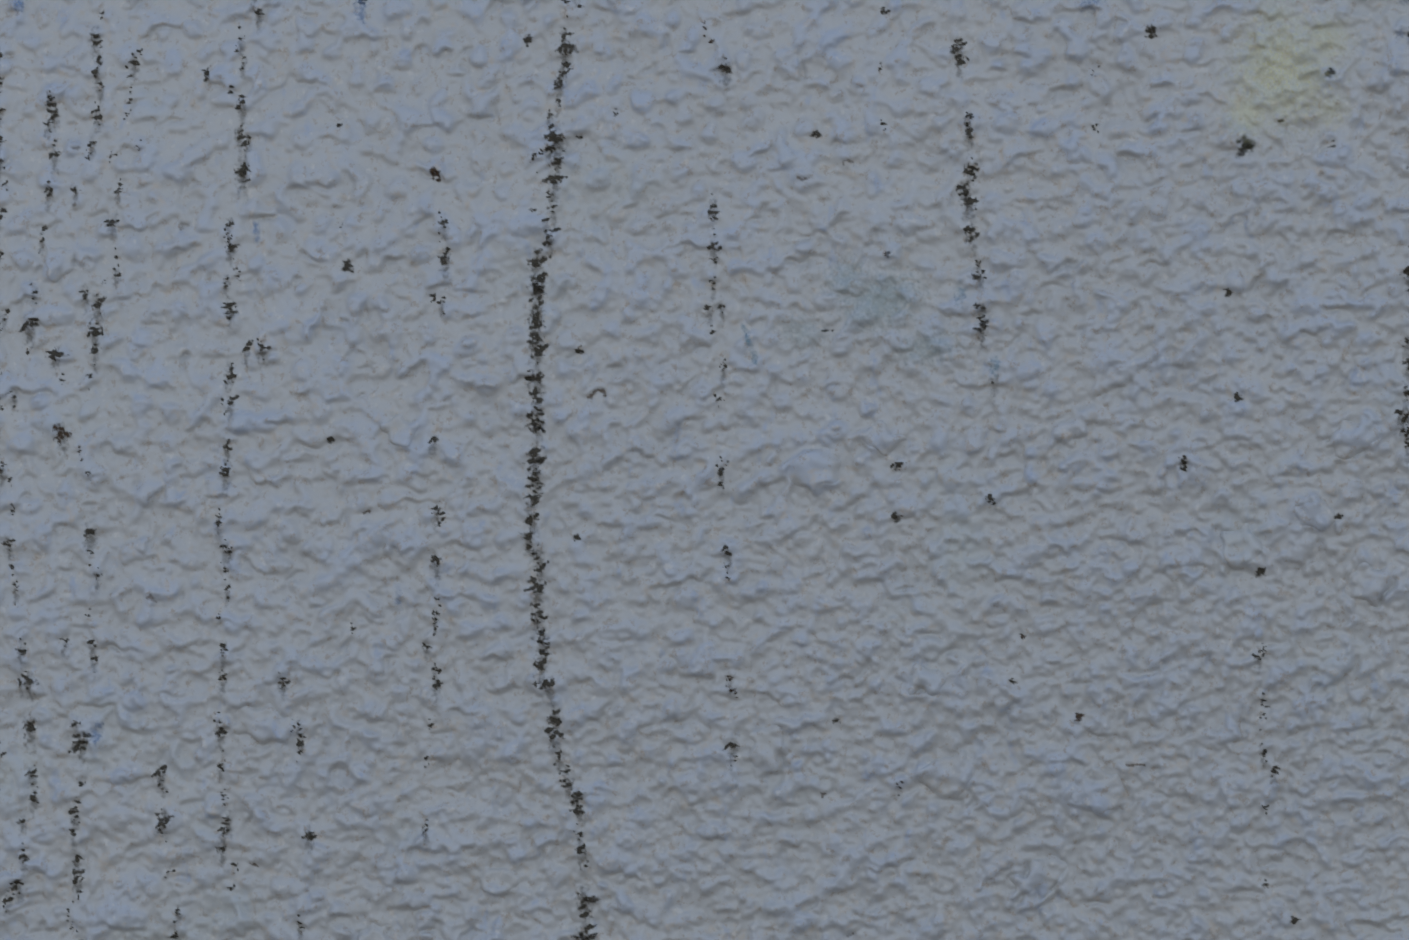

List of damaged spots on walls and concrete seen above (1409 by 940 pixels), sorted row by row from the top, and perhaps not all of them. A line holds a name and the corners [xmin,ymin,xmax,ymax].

damp [91,12,104,88]
damp [951,39,969,65]
damp [44,91,59,158]
damp [228,85,251,146]
damp [956,157,979,210]
damp [79,248,121,378]
damp [221,338,271,415]
damp [524,0,583,689]
damp [1395,338,1409,448]
damp [53,425,91,475]
damp [544,710,584,815]
damp [574,893,599,940]